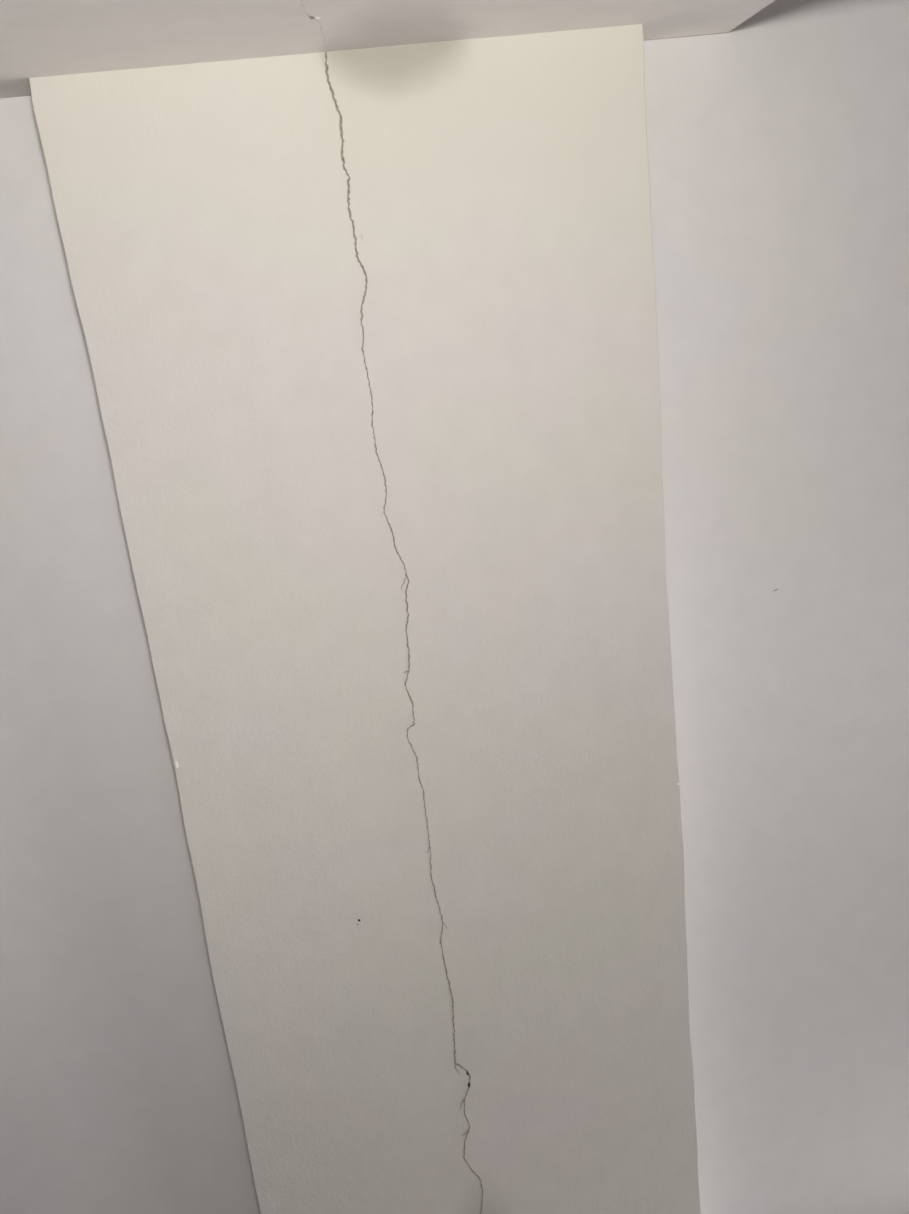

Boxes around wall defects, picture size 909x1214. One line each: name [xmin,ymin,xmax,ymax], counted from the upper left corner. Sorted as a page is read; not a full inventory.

crack [300,0,483,1214]